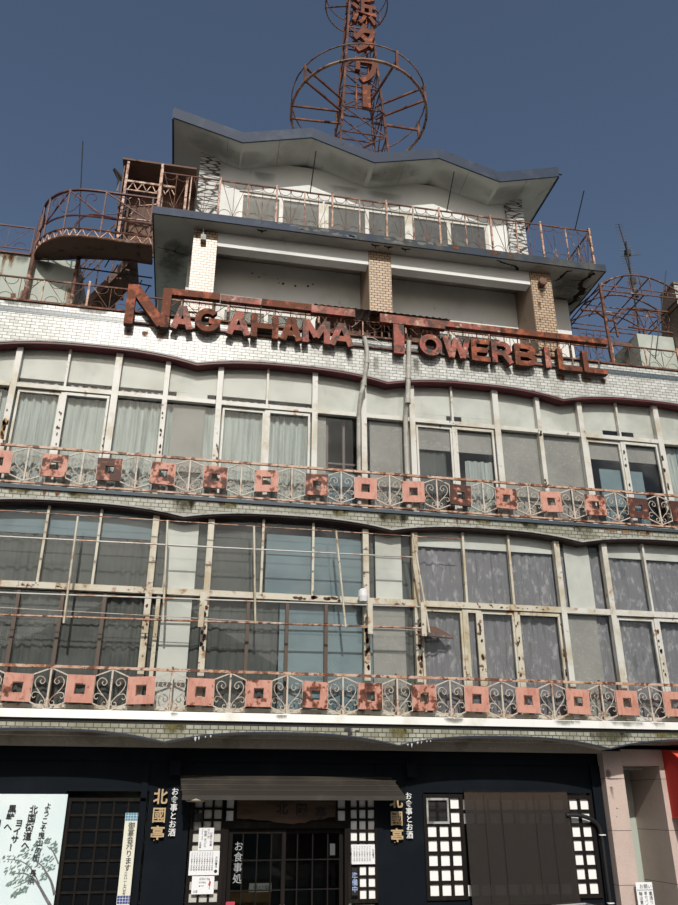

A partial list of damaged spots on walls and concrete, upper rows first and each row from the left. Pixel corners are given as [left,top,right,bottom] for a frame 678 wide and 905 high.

crack [553,270,595,306]